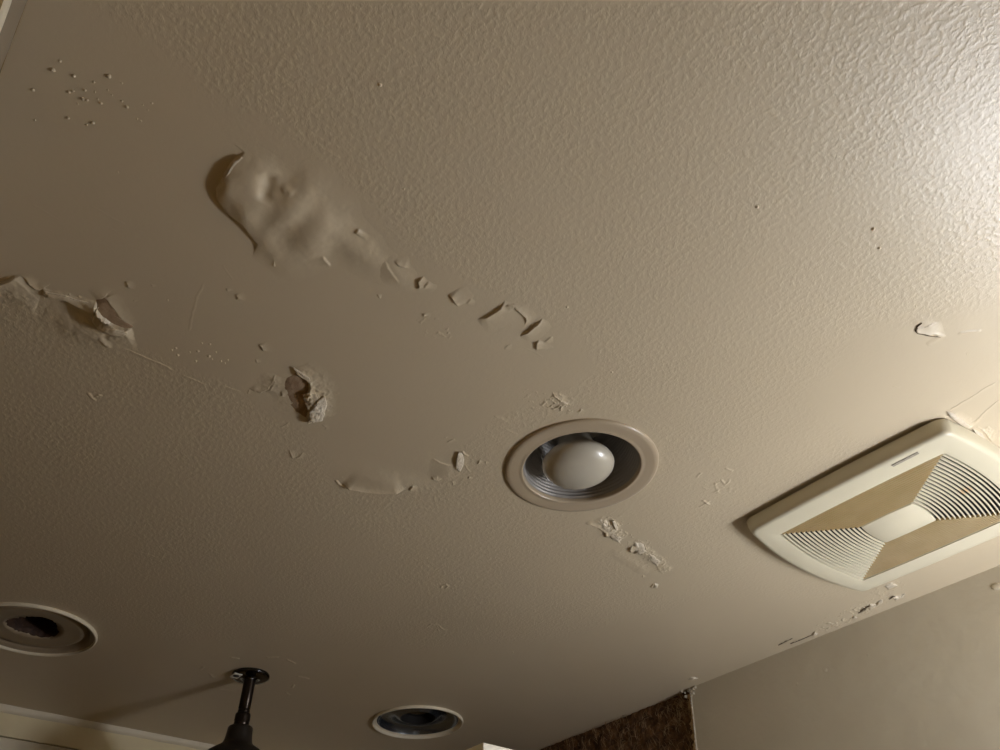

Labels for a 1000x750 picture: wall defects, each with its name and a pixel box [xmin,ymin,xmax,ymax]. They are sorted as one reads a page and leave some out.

peeling [0,269,138,355]
peeling [477,300,553,351]
peeling [912,316,946,346]
peeling [249,361,342,430]
peeling [427,436,489,486]
peeling [586,506,685,588]